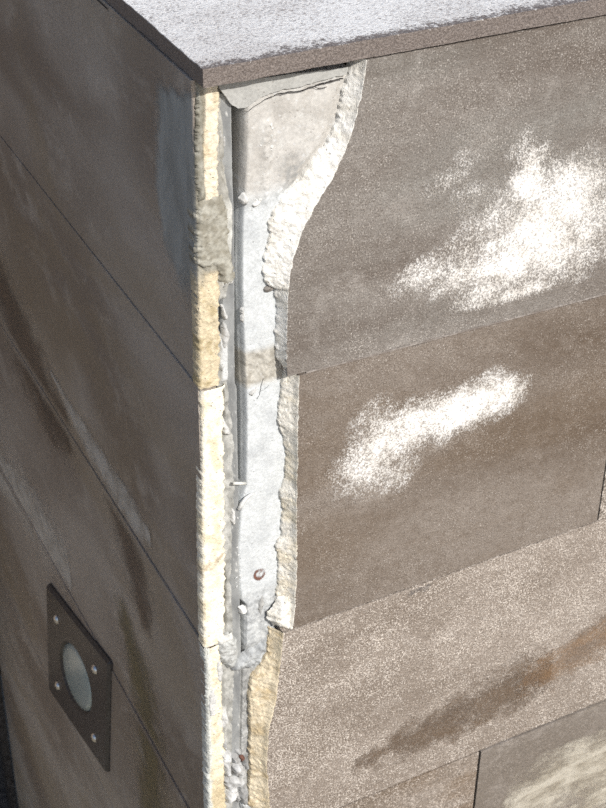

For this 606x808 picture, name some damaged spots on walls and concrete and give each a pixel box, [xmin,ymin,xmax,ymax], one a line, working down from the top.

damp [397,131,606,310]
spalling [187,58,367,808]
damp [333,368,532,495]